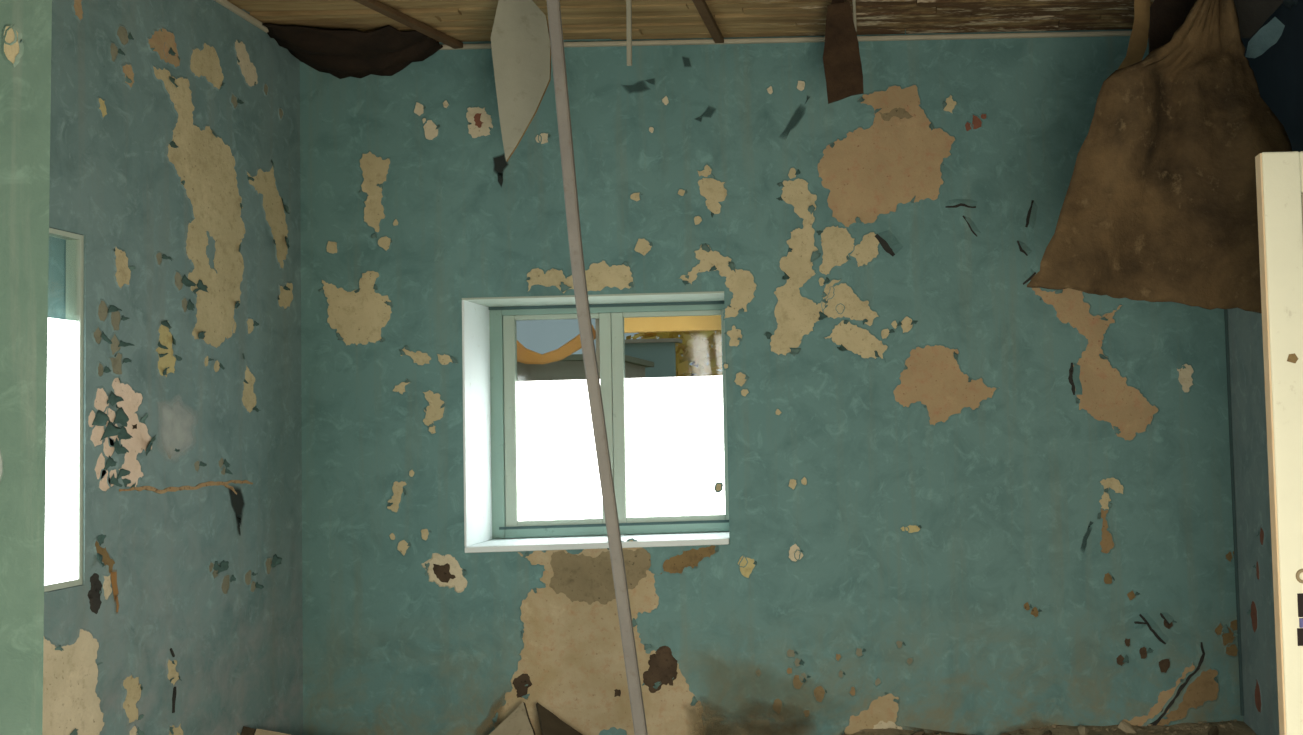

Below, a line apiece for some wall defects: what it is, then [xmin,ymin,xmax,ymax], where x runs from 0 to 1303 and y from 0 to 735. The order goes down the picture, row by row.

peeling [108,24,293,380]
peeling [318,269,394,347]
peeling [358,150,400,253]
peeling [676,84,999,427]
peeling [86,298,180,493]
peeling [392,345,458,435]
peeling [1030,287,1160,442]
spalling [425,562,466,583]
peeling [42,627,105,735]
flaking render [492,538,720,735]
flaking render [834,647,903,735]
flaking render [1115,637,1220,726]